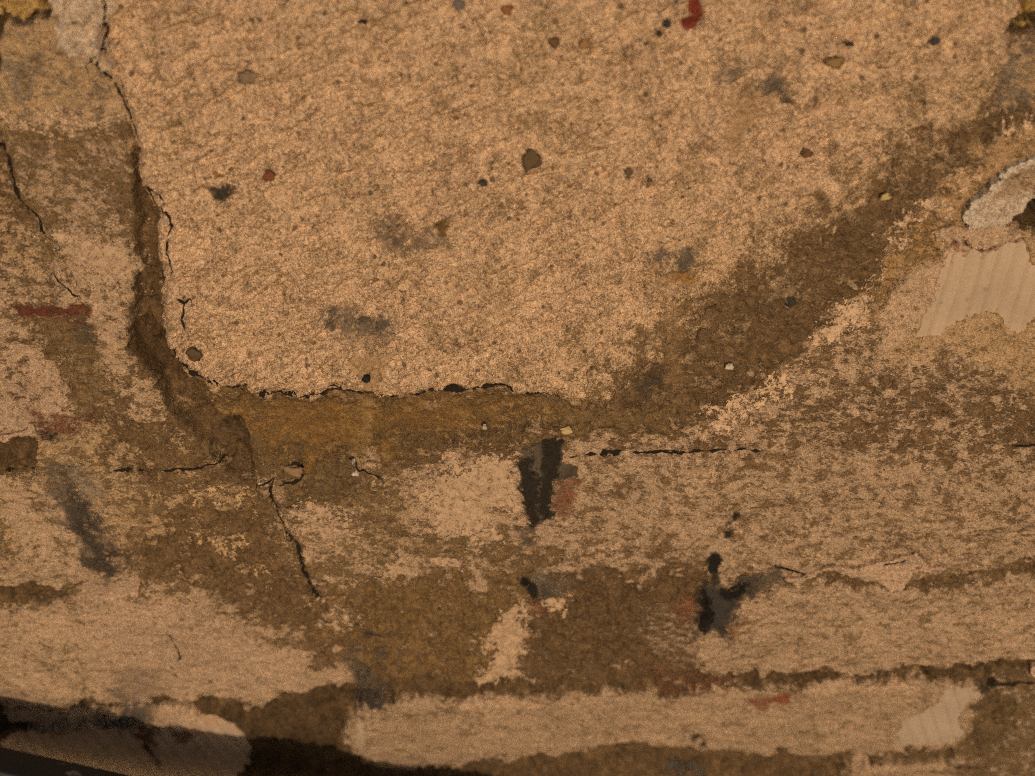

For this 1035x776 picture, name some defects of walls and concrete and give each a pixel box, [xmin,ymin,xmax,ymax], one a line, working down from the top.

crack [0,142,45,234]
crack [53,273,81,298]
spalling [915,154,1035,340]
crack [256,462,327,608]
damp [516,438,564,550]
crack [570,448,774,458]
flaking render [457,692,543,712]
flaking render [812,673,921,694]
spalling [851,687,981,775]